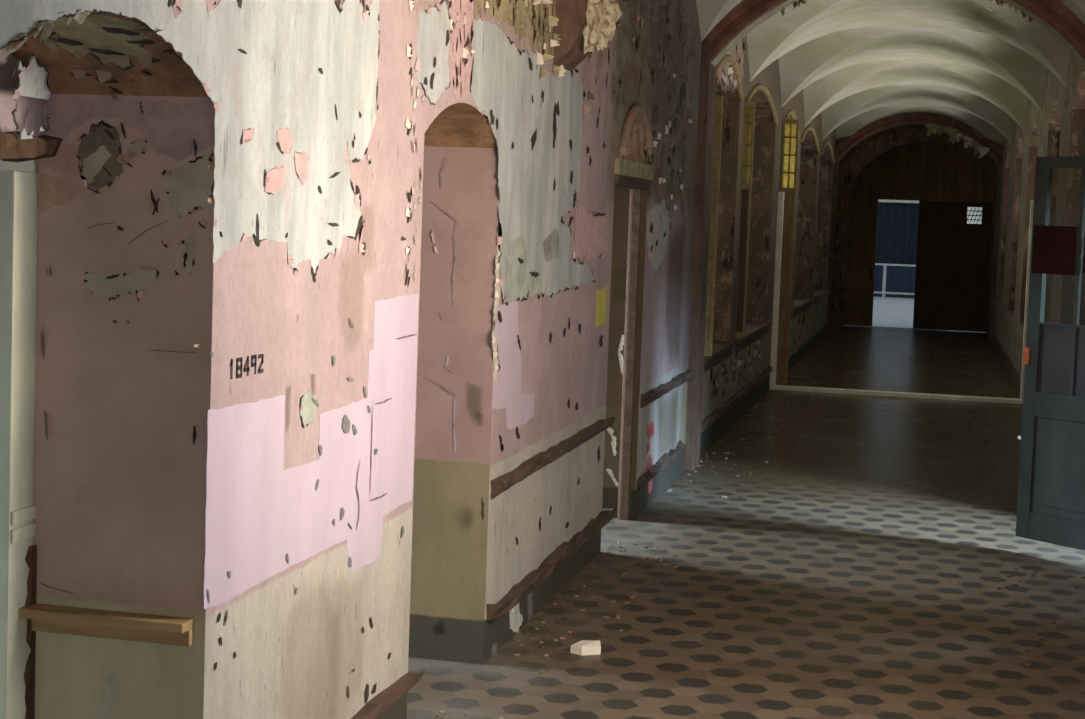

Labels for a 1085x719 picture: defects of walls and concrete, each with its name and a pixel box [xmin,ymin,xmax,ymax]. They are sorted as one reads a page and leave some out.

peeling [0,0,380,282]
peeling [402,236,416,286]
peeling [405,0,655,383]